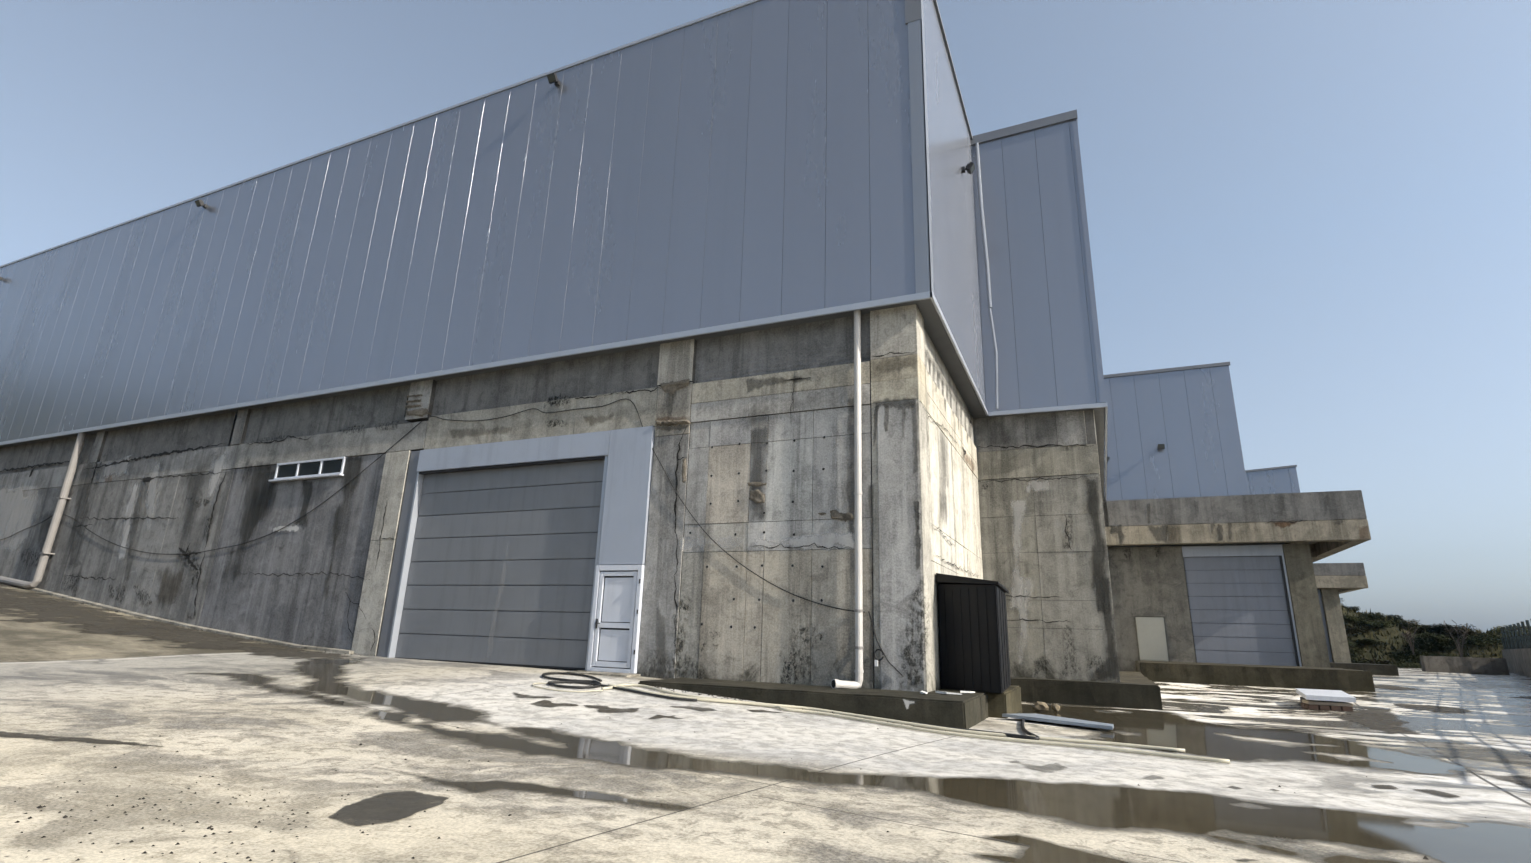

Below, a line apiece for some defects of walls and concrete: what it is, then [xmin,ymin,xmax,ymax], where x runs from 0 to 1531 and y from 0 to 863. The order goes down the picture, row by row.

water stain [876,399,915,409]
water stain [104,457,159,559]
water stain [186,454,226,505]
water stain [900,501,928,685]
water stain [1035,478,1132,679]